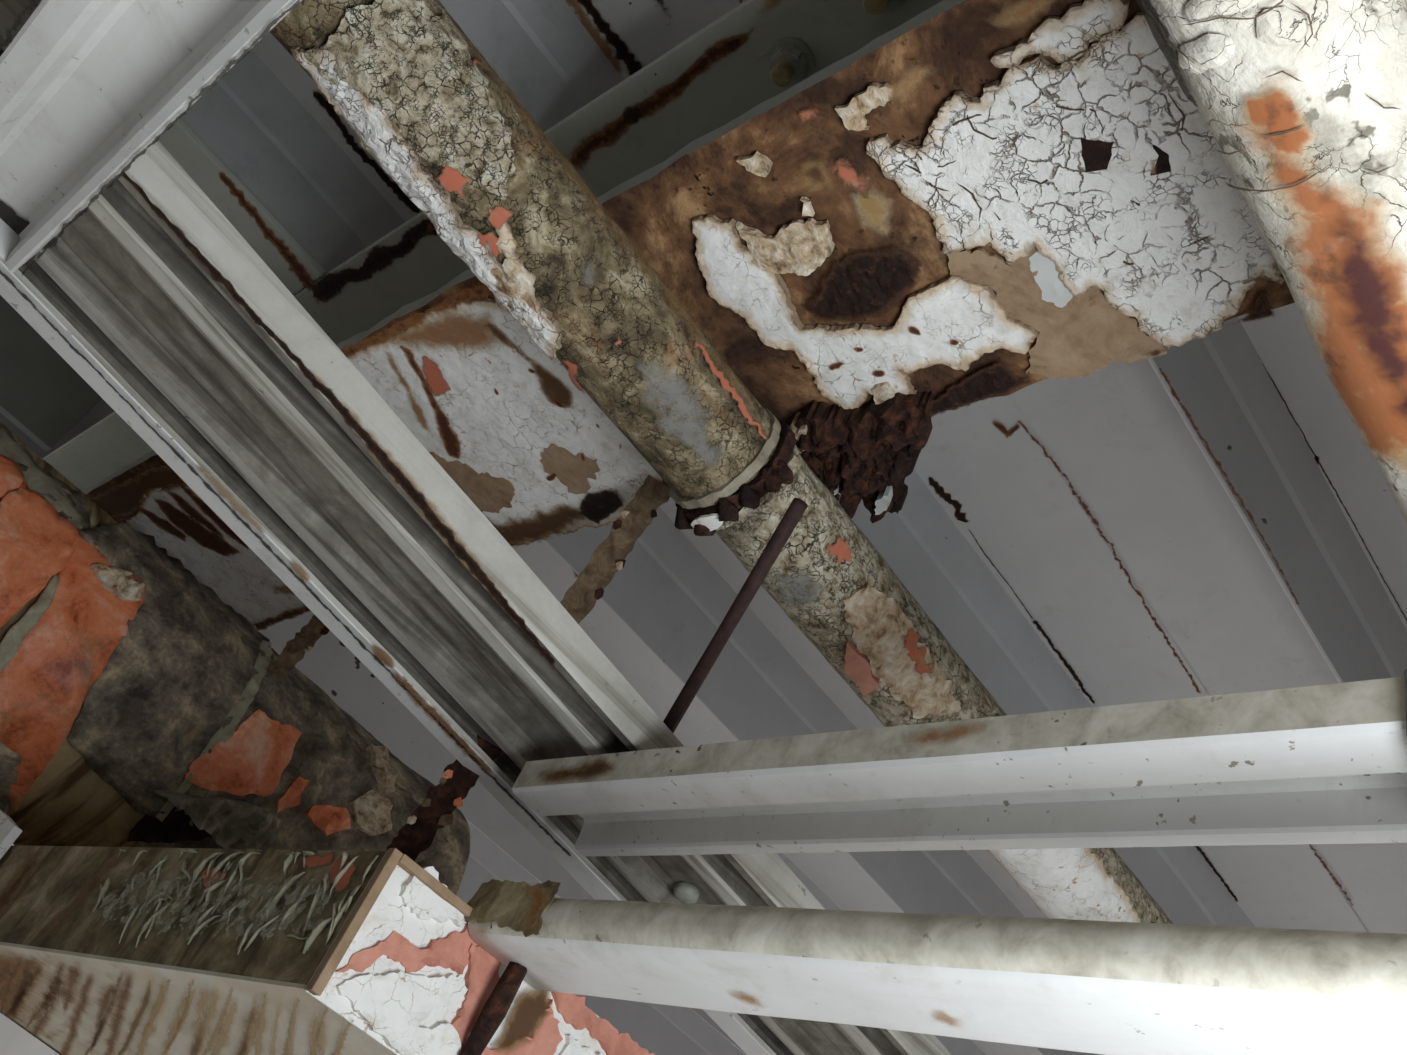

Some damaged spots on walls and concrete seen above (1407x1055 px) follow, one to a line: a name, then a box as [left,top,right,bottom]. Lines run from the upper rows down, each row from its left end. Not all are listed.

peeling [290,0,663,546]
peeling [692,0,1285,411]
crack [1150,0,1313,81]
crack [1215,125,1326,192]
corrosion [1240,91,1407,471]
crack [1366,94,1400,109]
corrosion [91,464,248,556]
corrosion [122,172,572,665]
corrosion [790,362,1036,524]
water stain [0,955,353,1055]
peeling [335,866,501,1055]
peeling [481,990,655,1055]